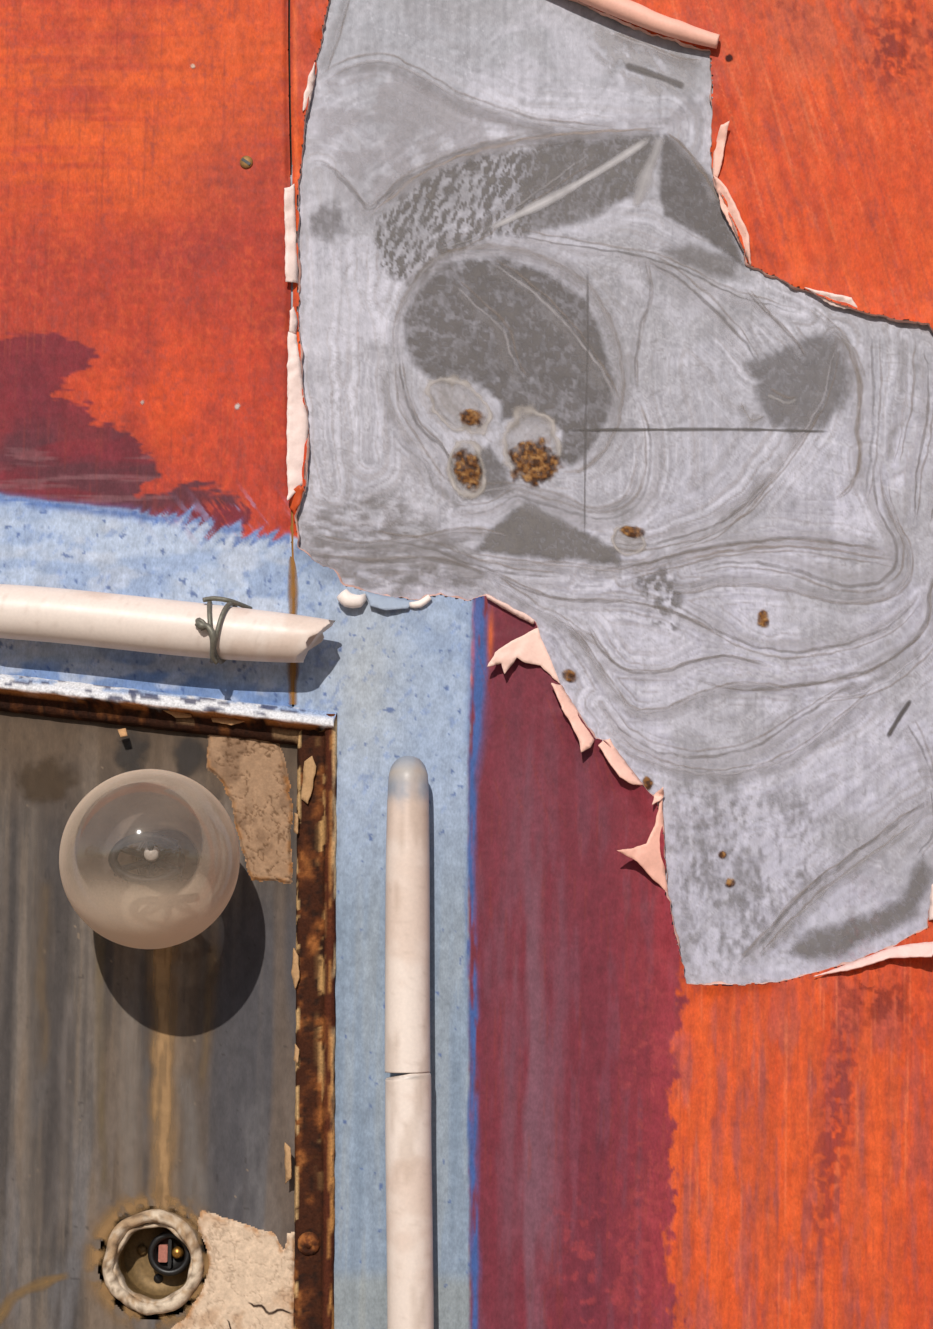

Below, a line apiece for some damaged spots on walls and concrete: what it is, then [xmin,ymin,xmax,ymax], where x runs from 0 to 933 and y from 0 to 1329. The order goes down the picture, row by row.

rust [425,376,492,498]
rust [503,407,561,486]
peeling [284,0,933,989]
rust [612,526,646,555]
peeling [206,718,317,884]
peeling [284,1143,292,1183]
peeling [171,1210,295,1329]